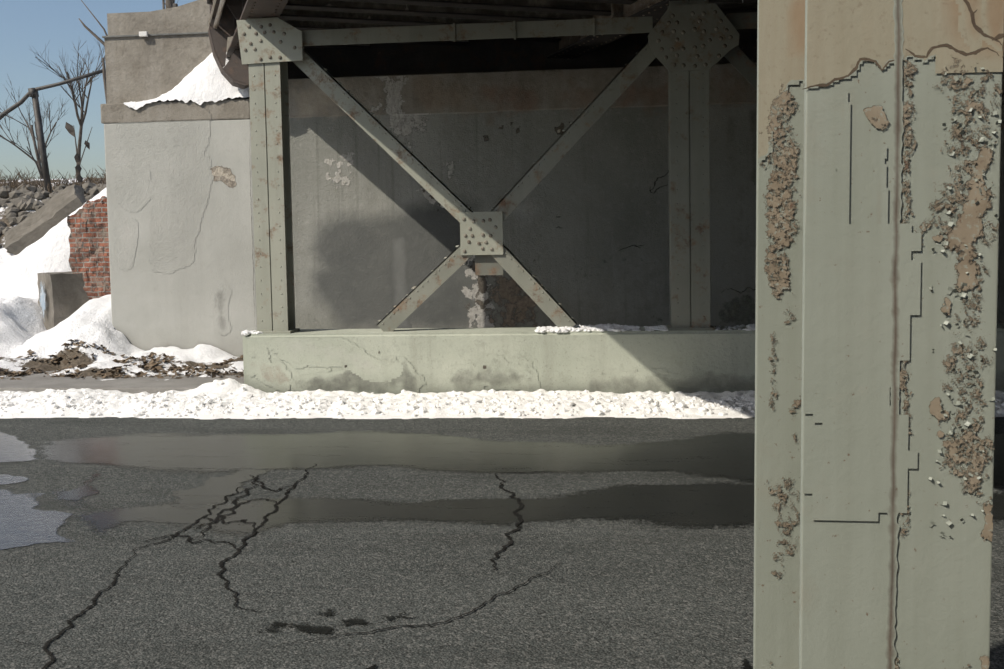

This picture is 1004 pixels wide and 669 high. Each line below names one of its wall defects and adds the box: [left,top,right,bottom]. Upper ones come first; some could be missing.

crack [964,0,1004,52]
spalling [210,166,237,188]
spalling [461,255,545,328]
spalling [719,295,756,322]
peeling [758,44,1003,542]
leakage [446,354,542,393]
leakage [582,365,755,394]
leakage [995,364,1004,392]
peeling [764,477,800,579]
crack [16,464,317,669]
crack [276,471,557,646]
crack [741,658,753,669]